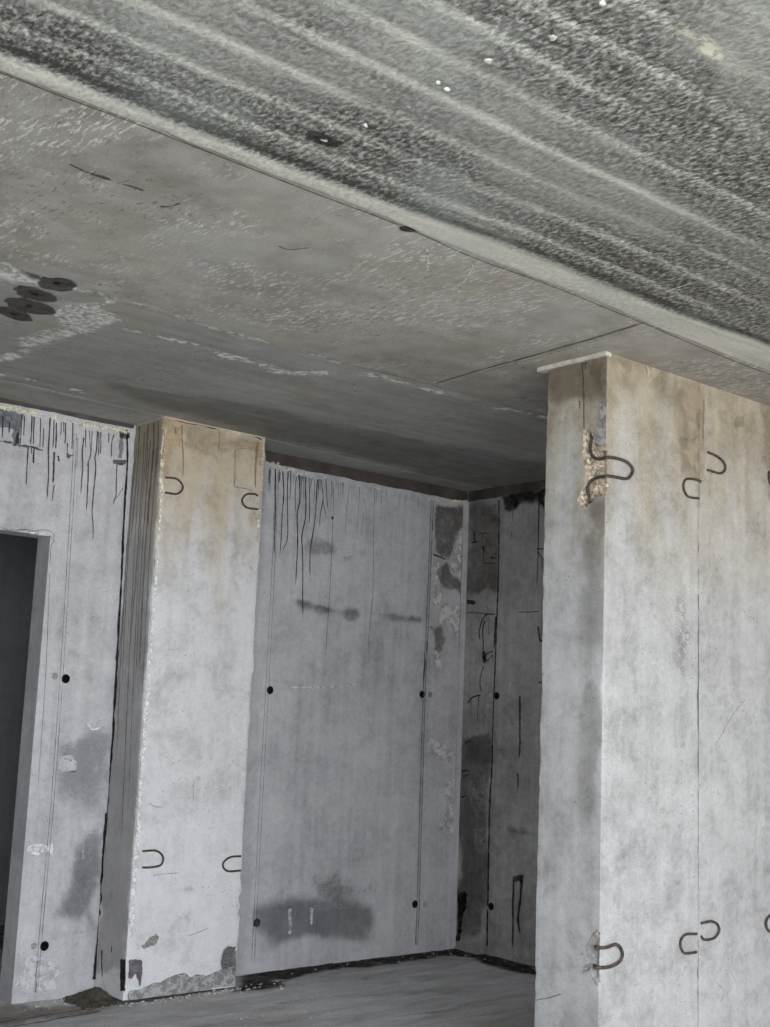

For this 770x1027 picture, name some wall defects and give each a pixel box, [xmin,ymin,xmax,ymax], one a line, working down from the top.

damp [0,262,120,376]
damp [214,351,346,376]
damp [363,372,448,395]
damp [0,409,159,534]
spalling [578,402,609,508]
damp [266,461,467,612]
peeling [430,534,462,636]
spalling [120,946,236,1000]
damp [235,891,536,991]
damp [512,875,524,946]